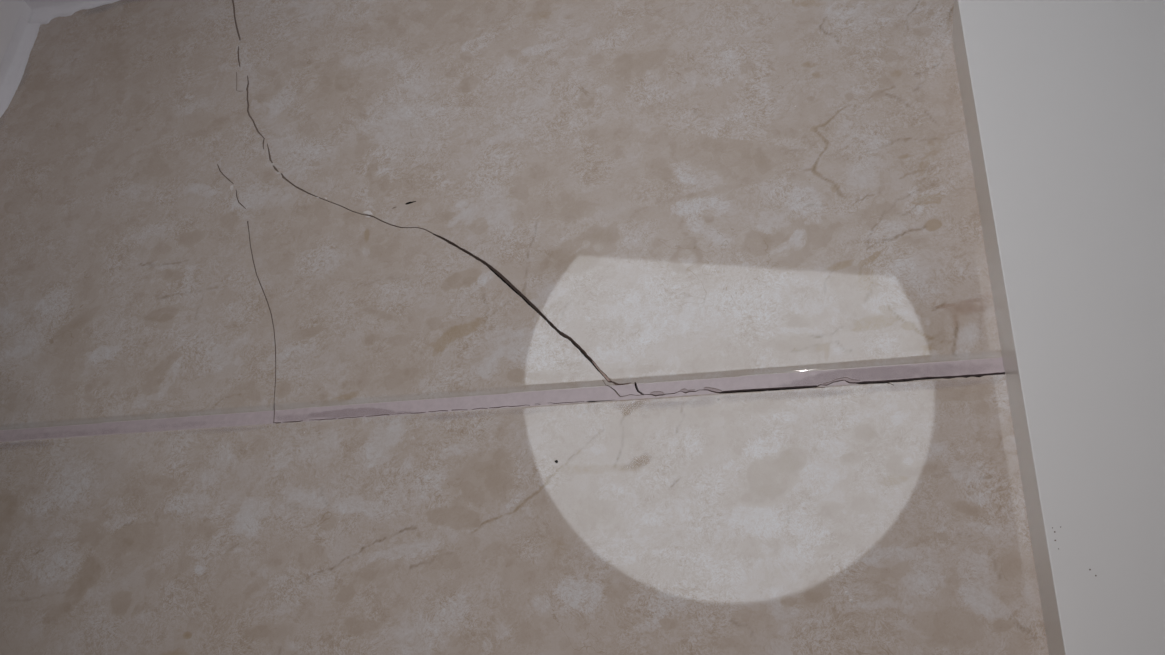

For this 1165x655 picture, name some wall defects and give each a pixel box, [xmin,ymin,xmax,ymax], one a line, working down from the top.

crack [217,0,1005,423]